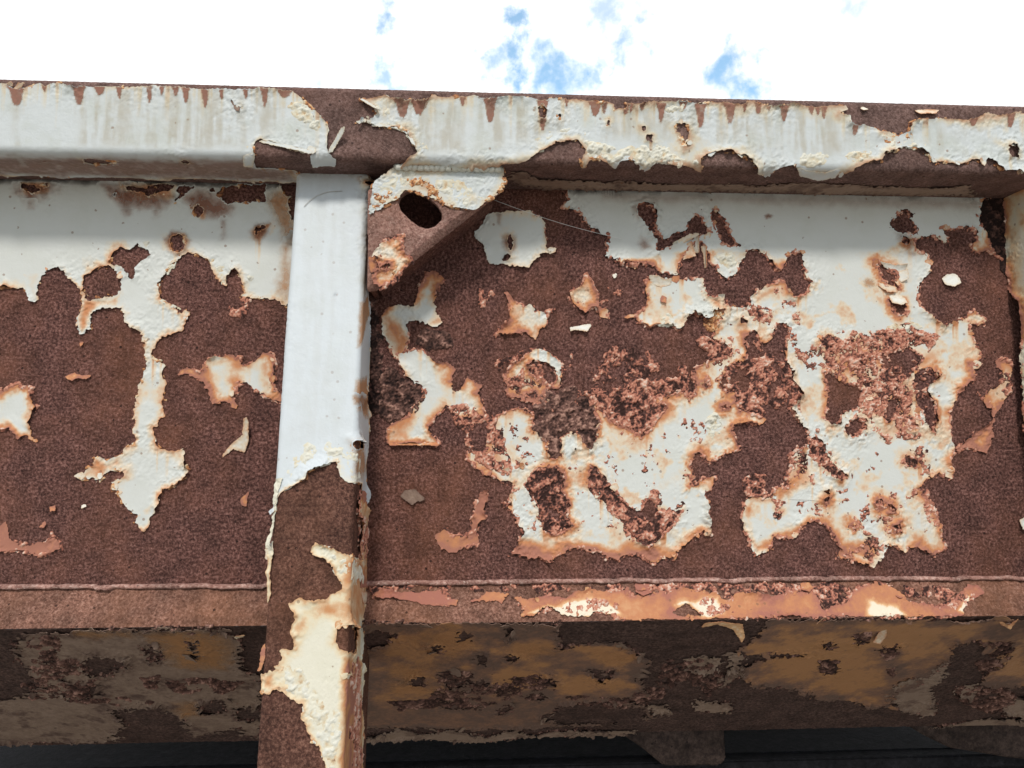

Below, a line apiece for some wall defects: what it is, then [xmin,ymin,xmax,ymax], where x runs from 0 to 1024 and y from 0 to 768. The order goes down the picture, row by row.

peeling [0,81,1024,604]
corrosion [357,449,365,473]
corrosion [152,634,224,667]
peeling [0,542,673,768]
peeling [515,581,1024,718]